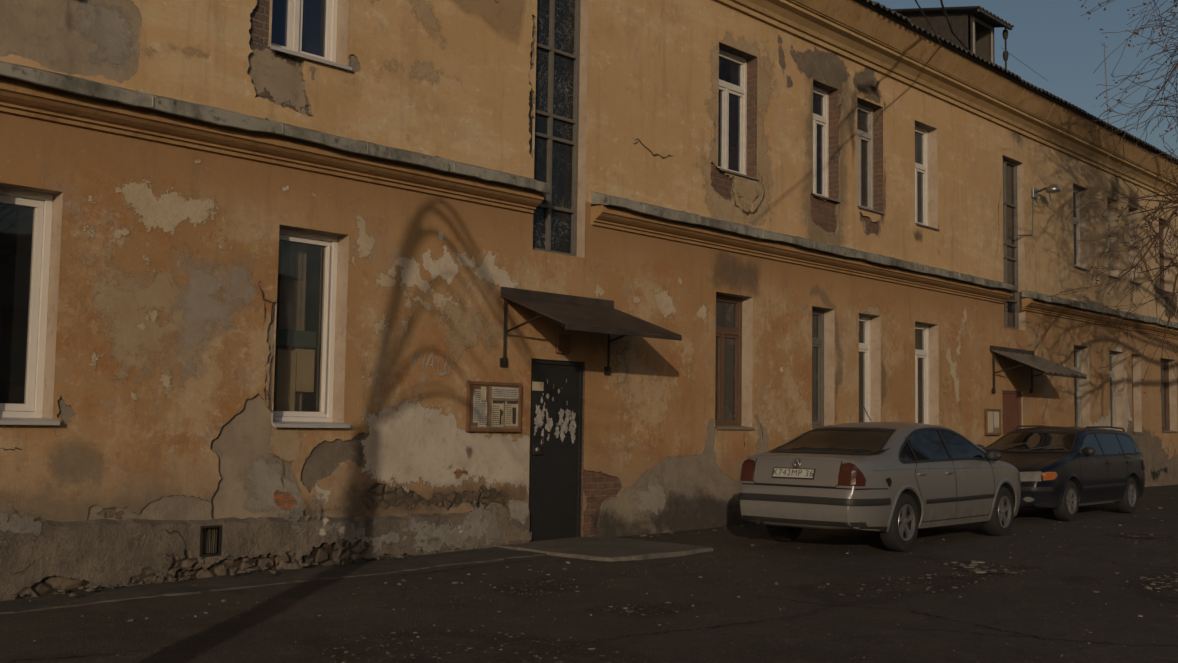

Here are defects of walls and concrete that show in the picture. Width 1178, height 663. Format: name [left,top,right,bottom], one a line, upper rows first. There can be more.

flaking render [247,0,316,117]
crack [632,137,671,159]
flaking render [701,32,776,225]
peeling [73,177,256,425]
crack [258,281,277,325]
peeling [351,214,530,361]
peeling [631,277,707,320]
flaking render [57,395,74,424]
peeling [125,373,532,586]